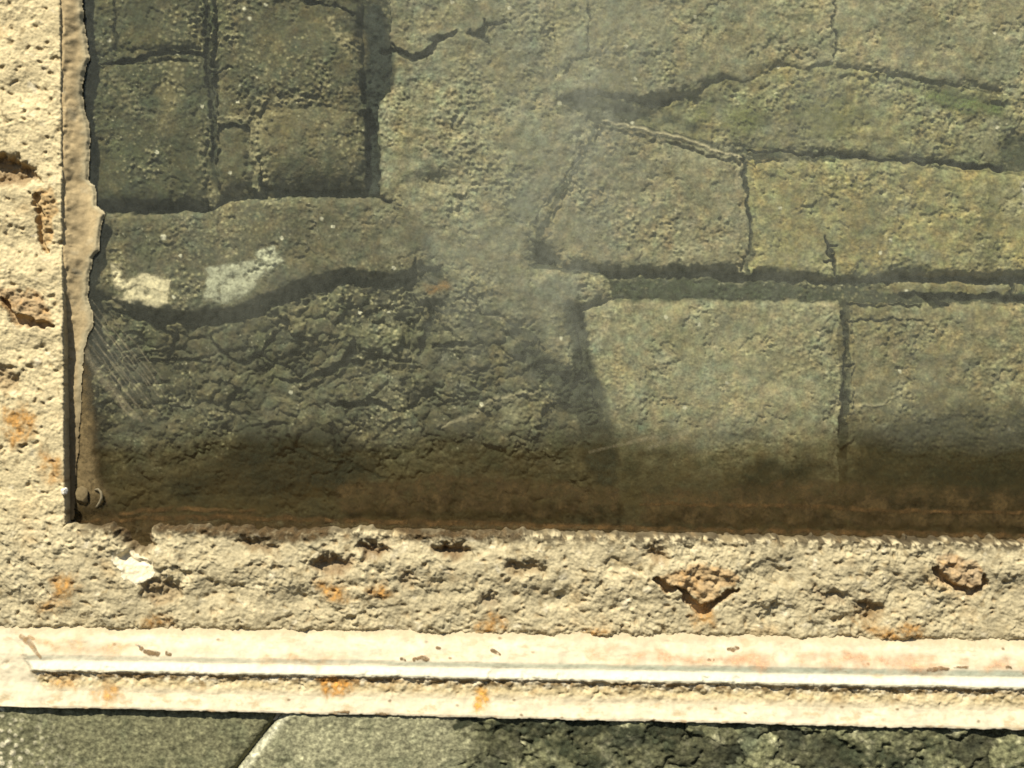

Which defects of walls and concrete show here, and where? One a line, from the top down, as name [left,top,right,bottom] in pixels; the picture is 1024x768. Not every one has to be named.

crack [391,19,505,62]
spalling [0,150,61,254]
damp [110,263,171,292]
damp [204,245,283,303]
spalling [0,285,56,330]
spalling [305,534,423,592]
spalling [430,537,476,565]
spalling [494,554,552,582]
spalling [635,540,743,618]
spalling [932,551,990,599]